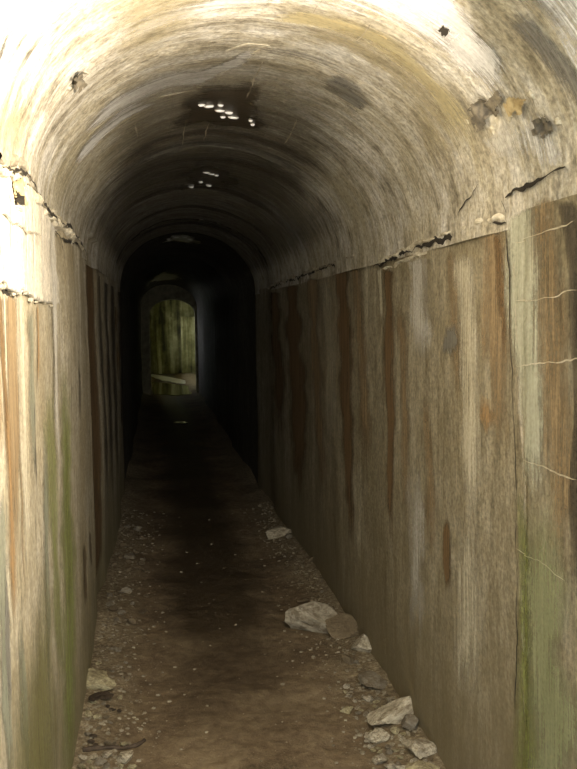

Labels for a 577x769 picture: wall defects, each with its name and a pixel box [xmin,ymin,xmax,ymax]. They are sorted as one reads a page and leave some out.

corrosion [0,297,24,600]
flaking render [0,173,60,307]
crack [0,152,87,256]
spalling [68,71,89,94]
corrosion [86,265,102,574]
corrosion [335,270,369,527]
corrosion [384,270,409,518]
crack [373,166,565,714]
corrosion [480,233,506,431]
spalling [464,90,535,157]
spalling [531,116,561,146]
water stain [0,507,30,768]